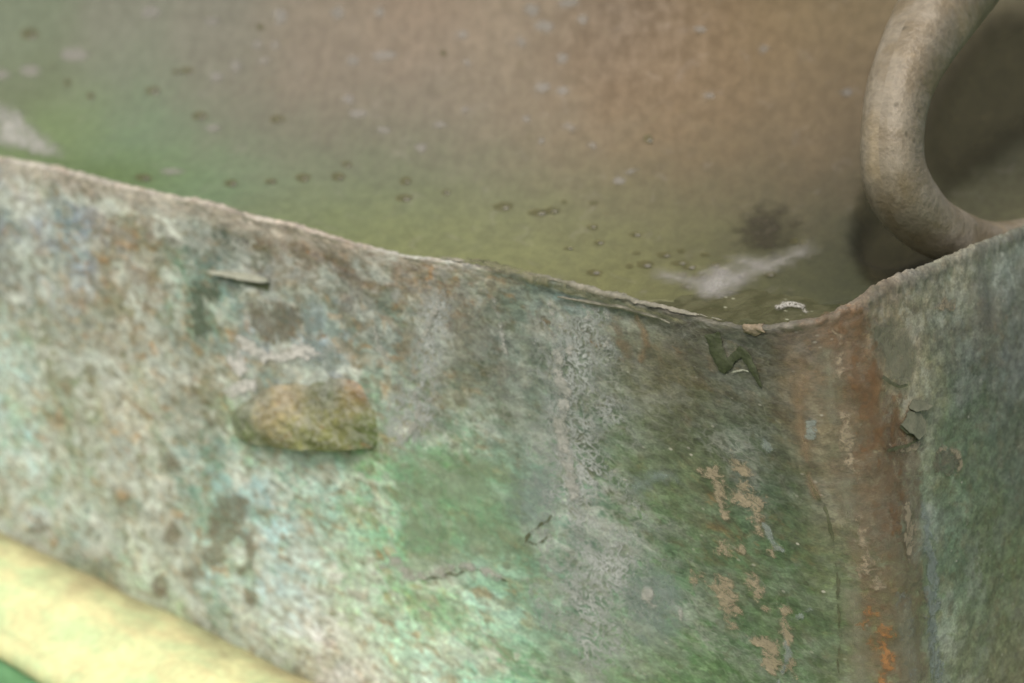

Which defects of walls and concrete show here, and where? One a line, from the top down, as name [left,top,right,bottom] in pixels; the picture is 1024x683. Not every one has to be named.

rust [824,305,905,590]
peeling [887,400,933,453]
peeling [696,459,784,558]
peeling [690,569,811,683]